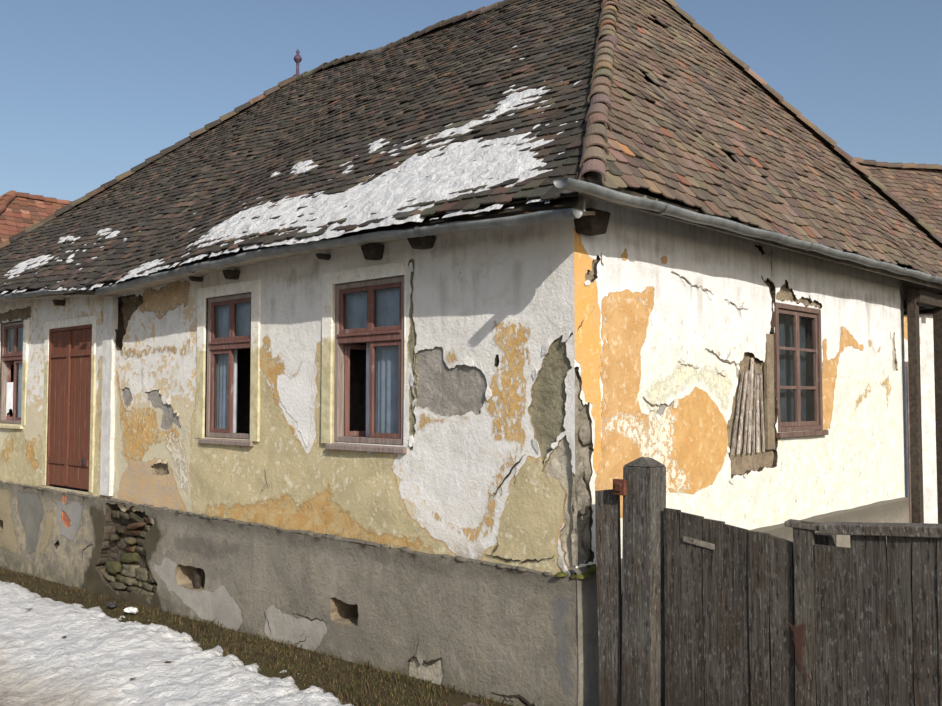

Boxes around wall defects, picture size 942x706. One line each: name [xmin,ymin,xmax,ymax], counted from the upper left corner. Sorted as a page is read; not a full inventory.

flaking render [0,306,31,323]
peeling [60,228,822,605]
crack [672,271,749,314]
peeling [822,326,880,430]
flaking render [883,315,908,401]
peeling [0,429,46,554]